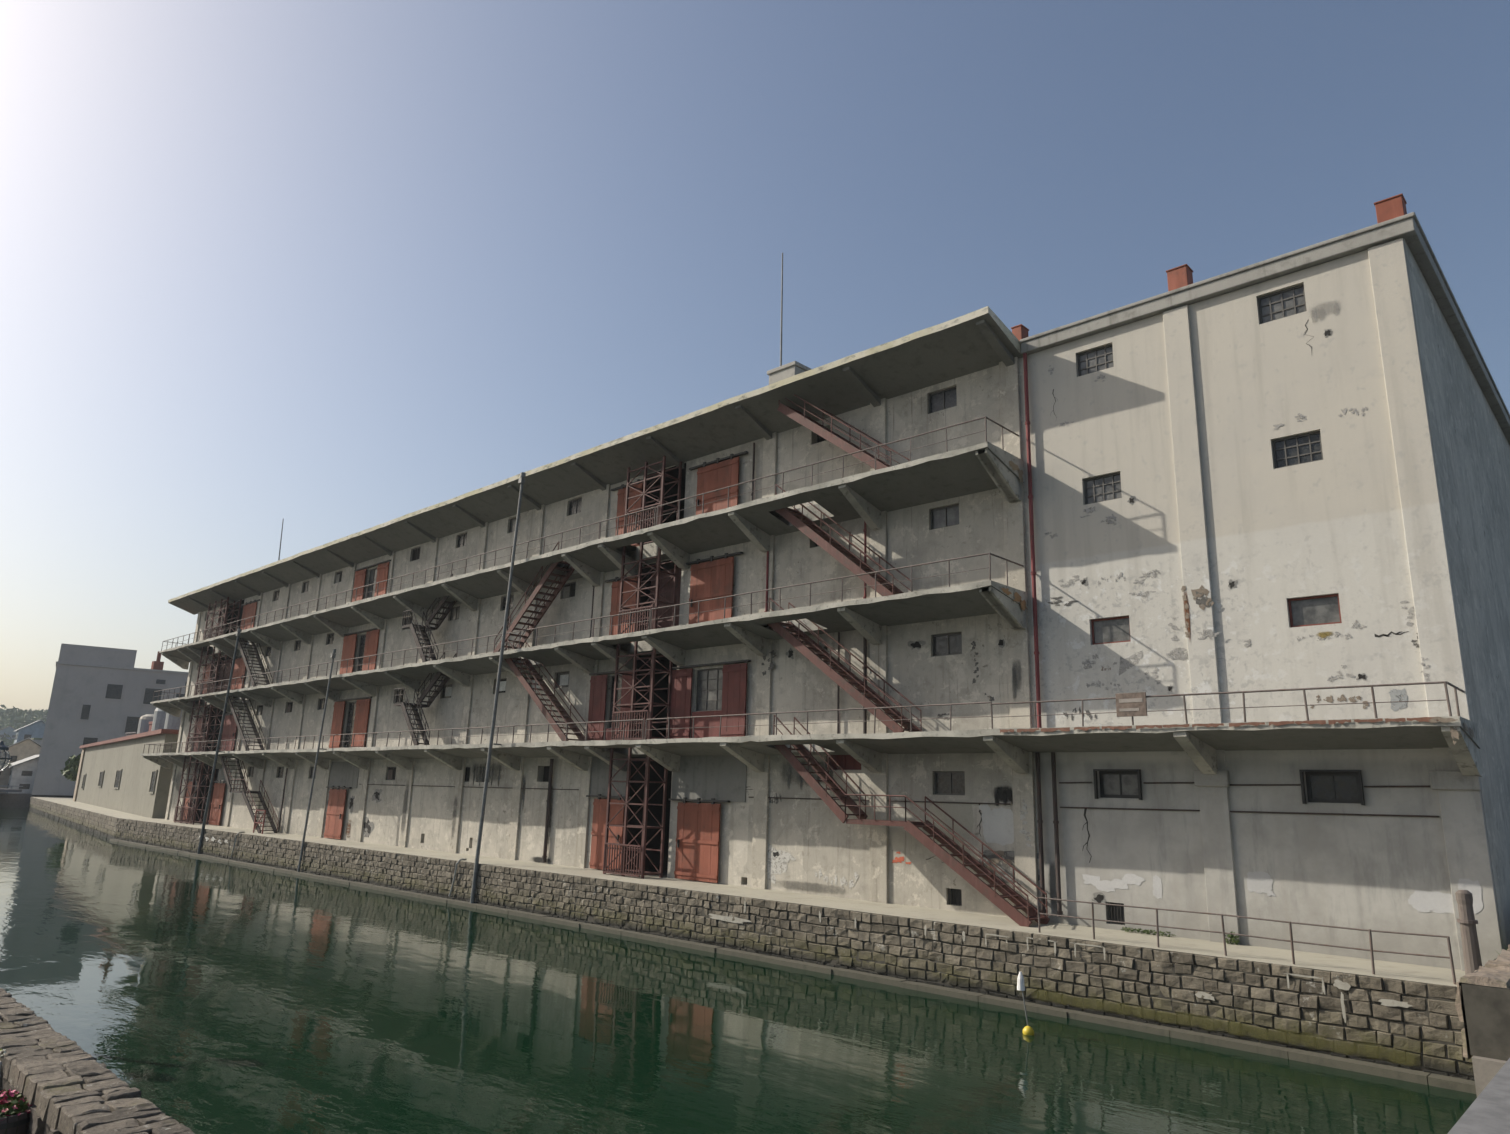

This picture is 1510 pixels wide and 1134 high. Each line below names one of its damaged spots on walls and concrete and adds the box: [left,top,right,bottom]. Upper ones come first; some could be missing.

peeling [1047,569,1160,606]
spalling [1191,586,1215,610]
peeling [1082,617,1219,692]
peeling [1400,600,1430,681]
peeling [1311,665,1369,709]
peeling [1389,688,1408,711]
crack [1082,809,1092,863]